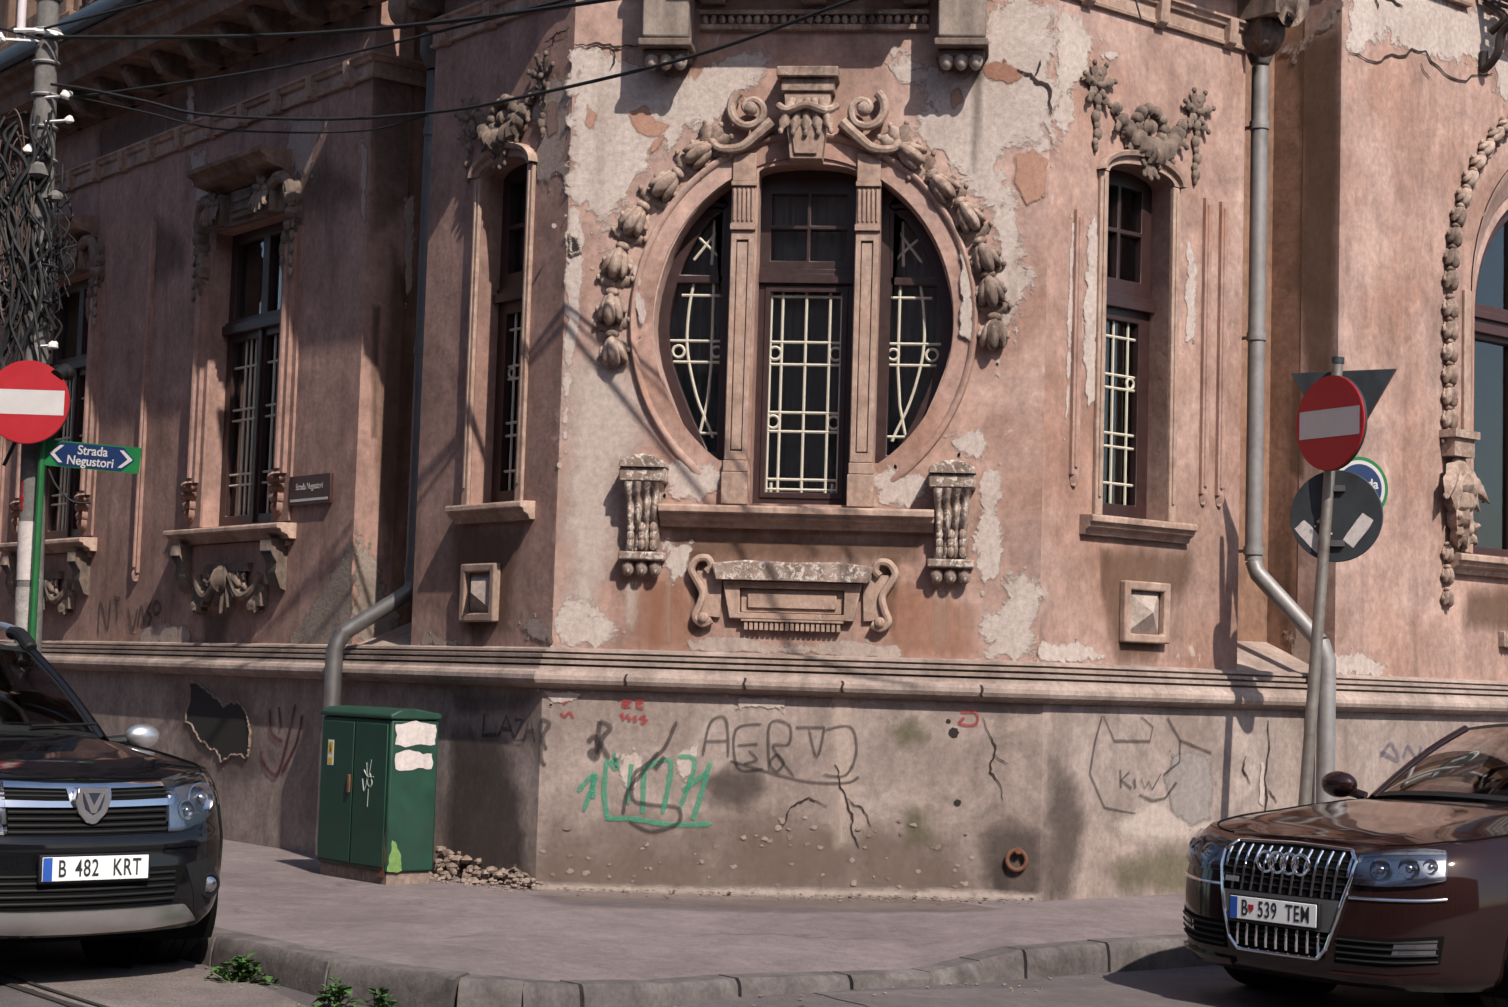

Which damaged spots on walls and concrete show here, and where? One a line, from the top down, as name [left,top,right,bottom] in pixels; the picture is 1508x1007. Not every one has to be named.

peeling [1281,0,1508,107]
crack [1349,48,1493,82]
peeling [884,0,1119,377]
peeling [530,45,772,468]
peeling [944,429,1105,663]
peeling [518,593,625,649]
crack [980,685,1009,800]
crack [782,765,871,848]